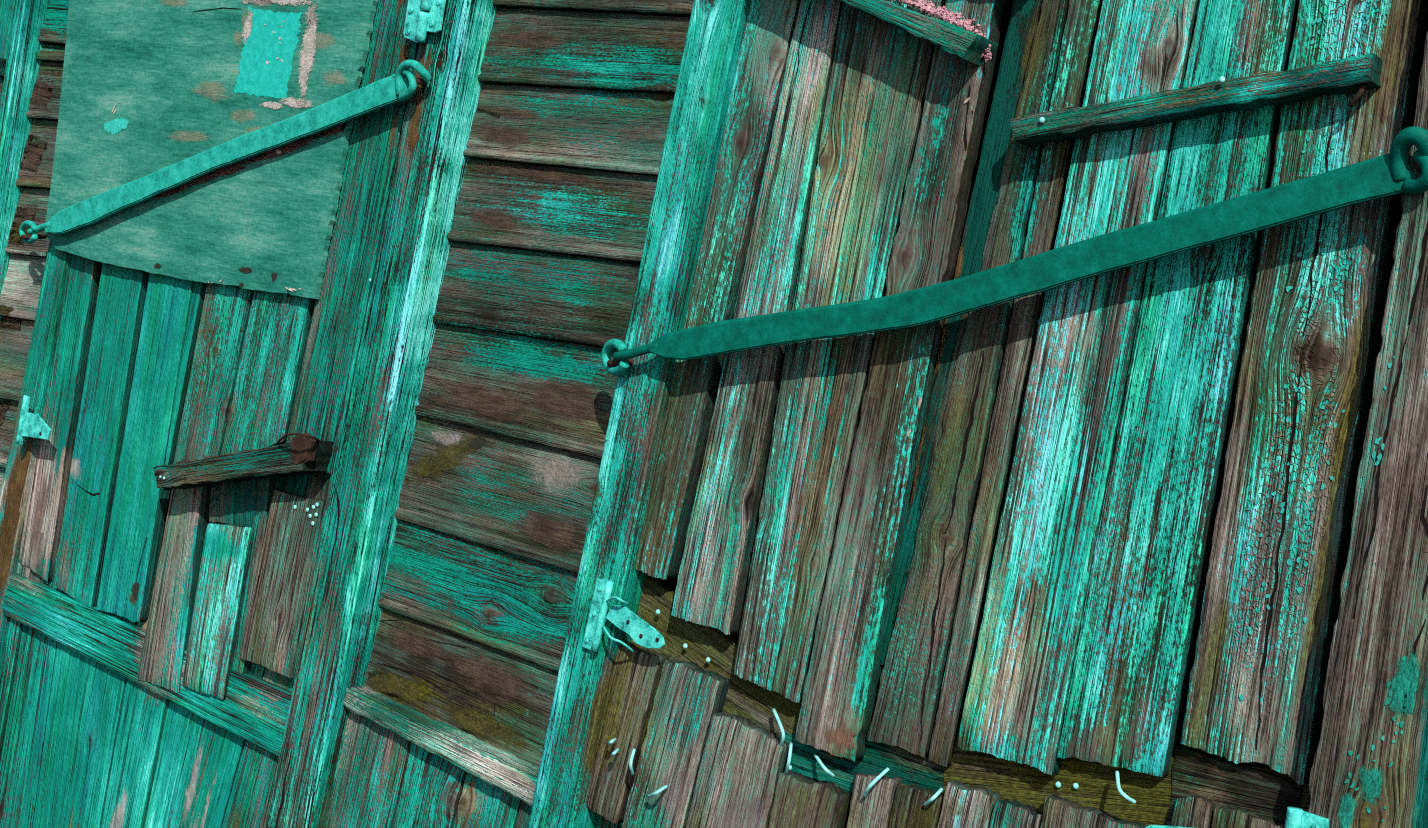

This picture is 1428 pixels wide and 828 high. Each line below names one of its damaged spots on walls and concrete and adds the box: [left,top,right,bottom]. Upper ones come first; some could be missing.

peeling [234,0,318,109]
spalling [963,85,973,151]
peeling [1302,119,1338,153]
spalling [954,247,963,279]
peeling [1286,226,1349,292]
peeling [70,459,100,495]
spalling [907,319,948,519]
peeling [1372,437,1384,466]
peeling [1245,491,1315,668]
peeling [1338,653,1420,828]
peeling [111,791,127,828]
peeling [185,750,214,828]